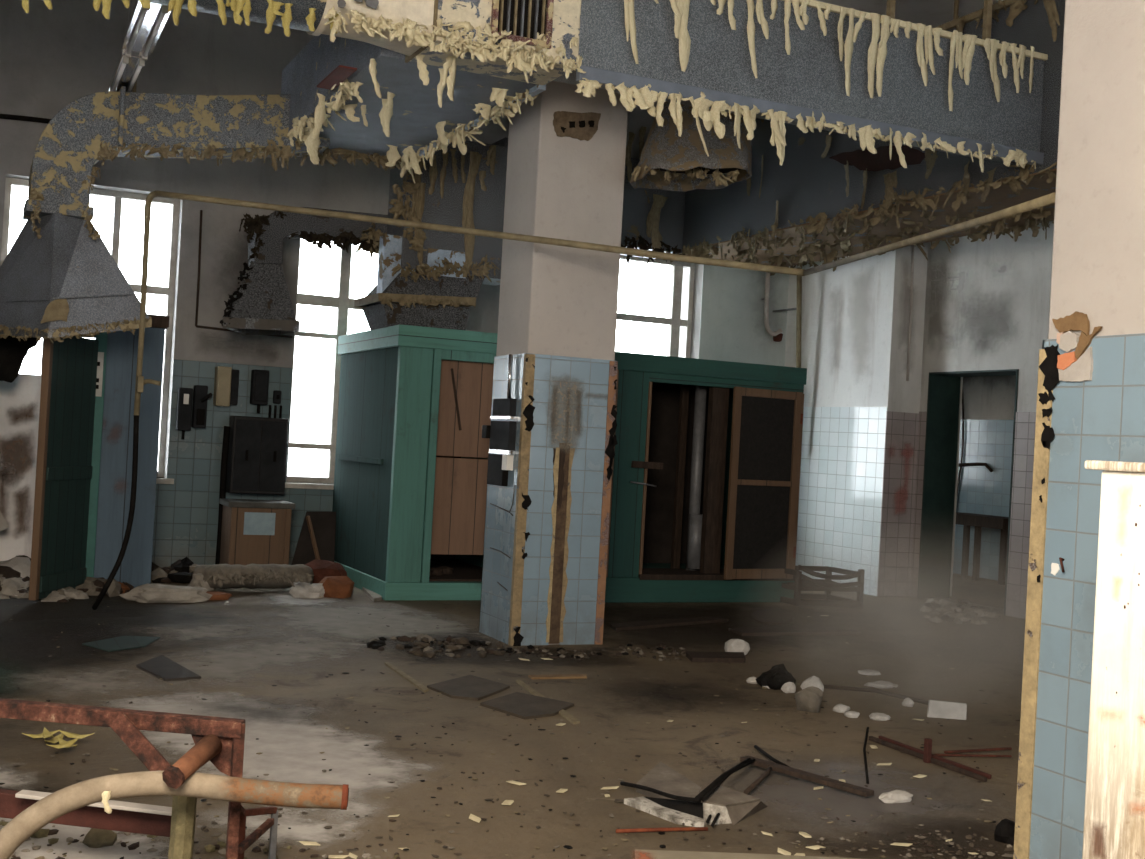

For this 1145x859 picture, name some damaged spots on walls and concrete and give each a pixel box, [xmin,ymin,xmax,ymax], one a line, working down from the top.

peeling [93,0,151,19]
peeling [216,0,252,26]
peeling [265,0,339,37]
peeling [624,0,638,64]
peeling [654,0,691,72]
peeling [710,0,1035,112]
peeling [305,93,326,164]
peeling [344,59,426,265]
peeling [416,54,487,278]
spalling [553,80,1027,215]
spalling [1038,311,1103,449]
peeling [546,443,575,644]